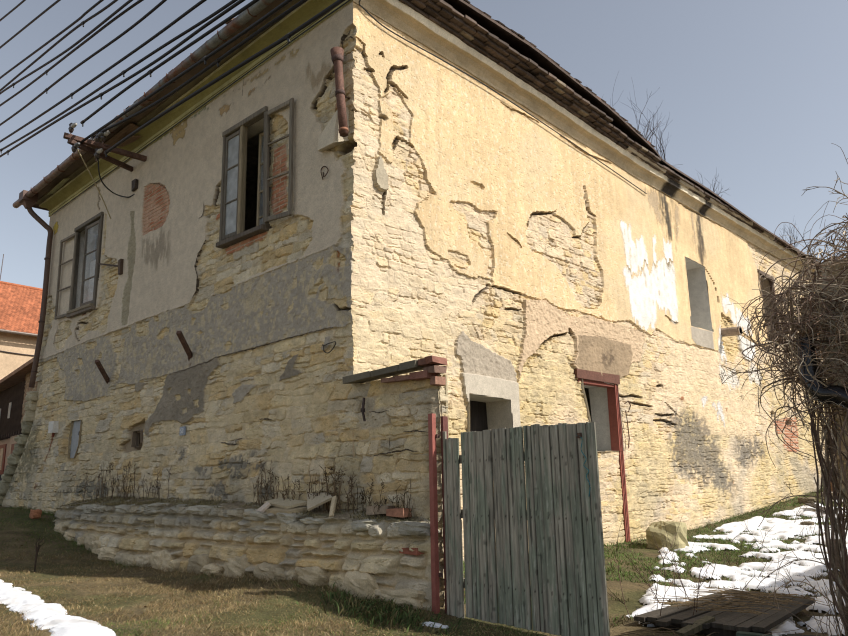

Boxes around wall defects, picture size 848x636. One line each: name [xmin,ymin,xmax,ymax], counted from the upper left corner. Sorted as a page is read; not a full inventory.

flaking render [143,182,170,235]
peeling [189,113,314,334]
spalling [308,23,360,308]
peeling [375,156,389,190]
spalling [448,200,498,277]
spalling [525,186,604,309]
peeling [78,225,170,384]
crack [536,328,575,351]
spalling [536,328,579,365]
flaking render [776,417,800,452]